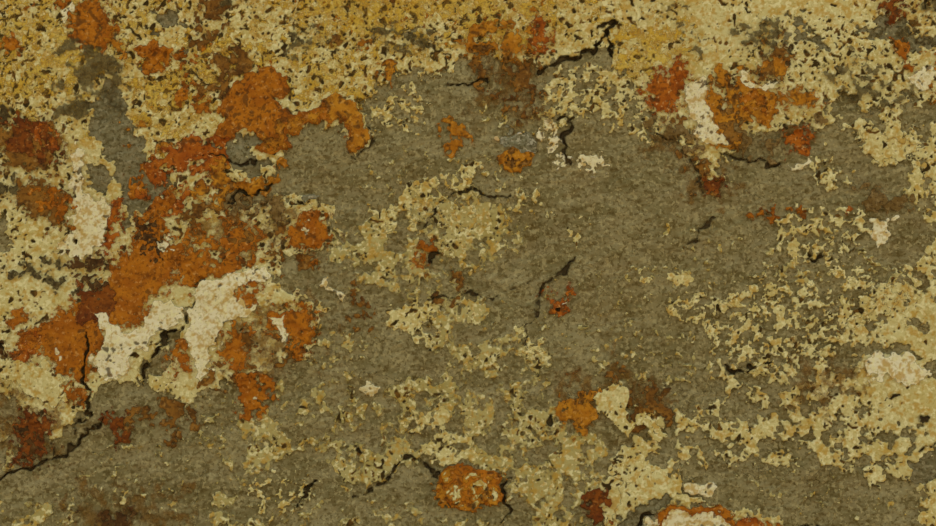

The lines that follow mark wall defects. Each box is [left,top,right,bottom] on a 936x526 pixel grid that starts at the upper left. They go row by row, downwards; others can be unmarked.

spalling [0,213,14,252]
spalling [56,73,177,260]
rust [0,0,376,472]
rust [445,0,556,133]
spalling [185,41,936,526]
crack [537,19,622,75]
rust [635,17,831,213]
peeling [855,14,936,54]
crack [0,335,104,480]
spalling [0,265,274,526]
rust [553,351,678,442]
rust [580,488,613,526]